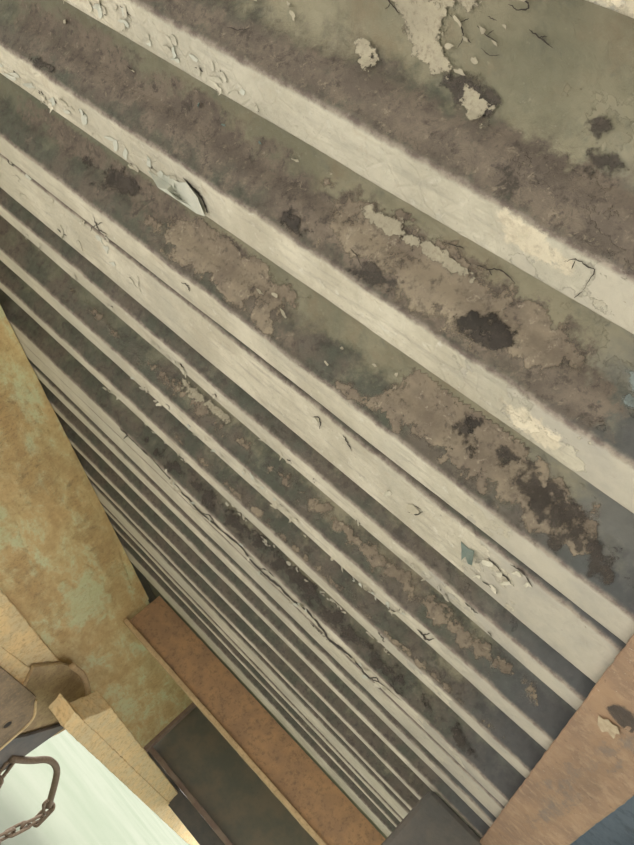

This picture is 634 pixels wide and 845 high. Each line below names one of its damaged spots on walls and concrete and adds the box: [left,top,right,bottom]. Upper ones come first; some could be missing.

peeling [354,37,379,71]
peeling [392,0,495,129]
peeling [0,63,87,125]
peeling [104,136,208,216]
damp [279,208,313,236]
crack [564,258,595,298]
damp [456,310,518,350]
damp [466,417,483,433]
crack [120,429,403,699]
peeling [461,542,532,594]